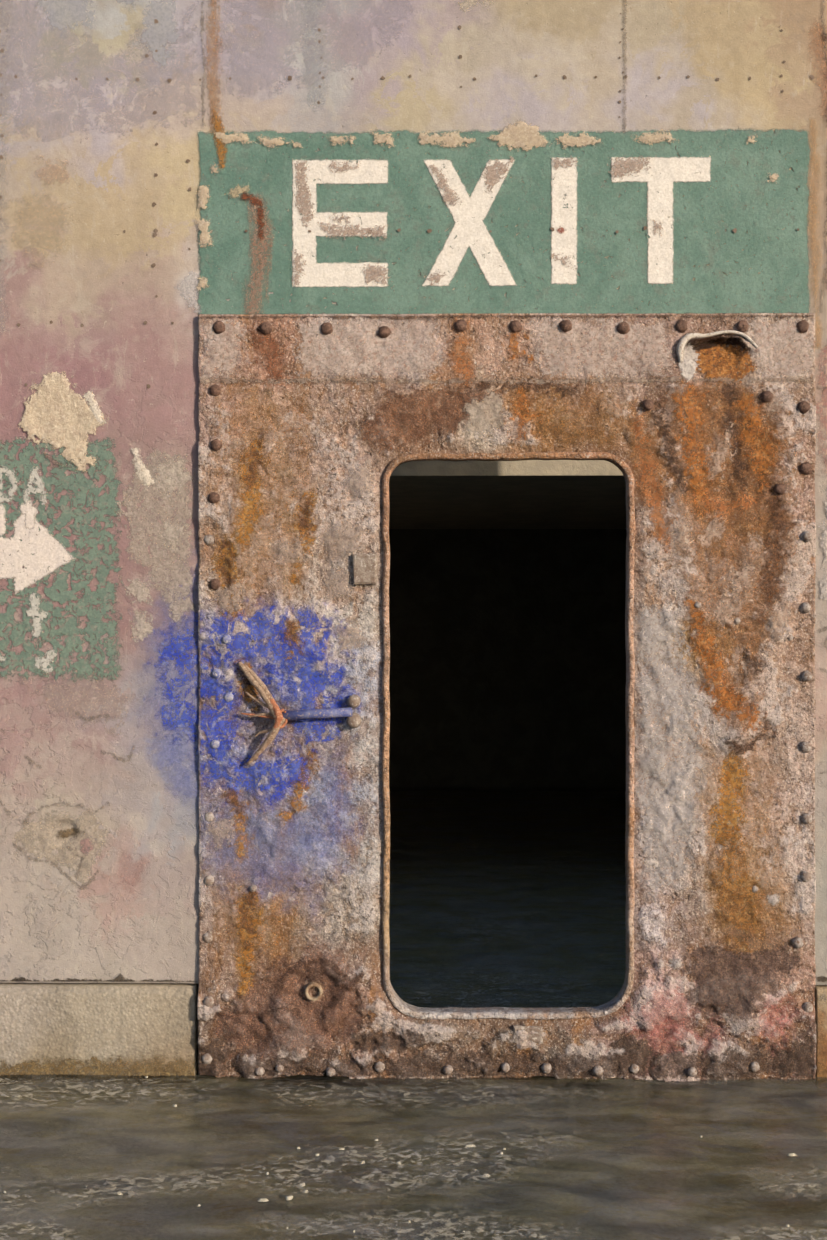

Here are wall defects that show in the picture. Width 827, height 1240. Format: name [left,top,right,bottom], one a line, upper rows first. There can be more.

peeling [195,165,219,247]
peeling [214,130,388,240]
peeling [418,121,601,192]
peeling [607,129,679,181]
corrosion [228,184,285,381]
peeling [17,371,109,471]
corrosion [360,319,615,452]
corrosion [211,440,271,620]
corrosion [290,489,317,584]
corrosion [633,381,800,1026]
spalling [13,802,109,890]
corrosion [200,886,814,1079]